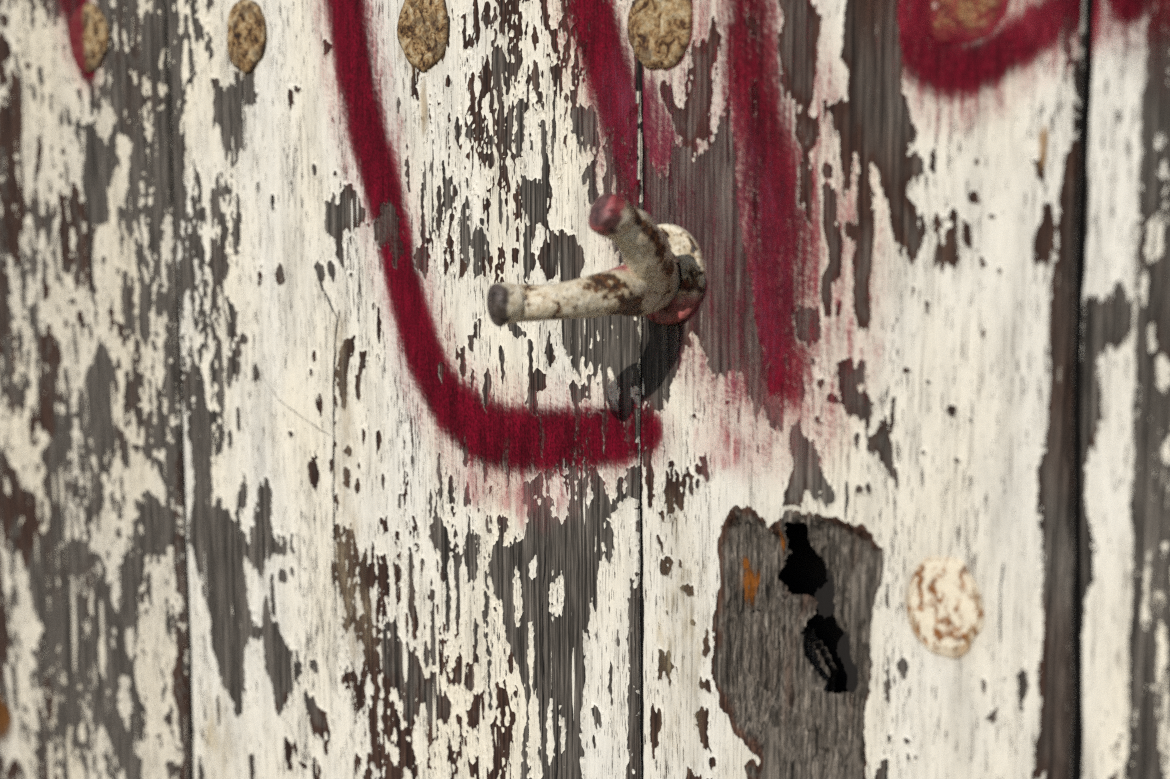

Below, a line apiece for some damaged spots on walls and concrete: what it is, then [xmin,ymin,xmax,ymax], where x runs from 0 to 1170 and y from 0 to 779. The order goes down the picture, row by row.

peeling [0,0,334,779]
peeling [980,0,1170,779]